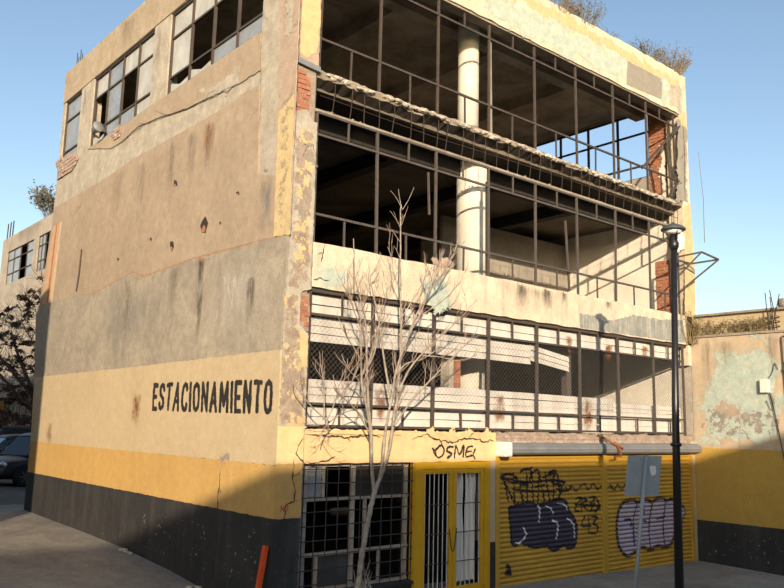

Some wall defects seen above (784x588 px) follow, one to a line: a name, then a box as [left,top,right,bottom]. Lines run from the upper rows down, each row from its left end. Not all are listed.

flaking render [56,151,78,180]
crack [118,87,231,145]
peeling [276,0,689,430]
peeling [414,290,784,445]
crack [253,434,379,583]